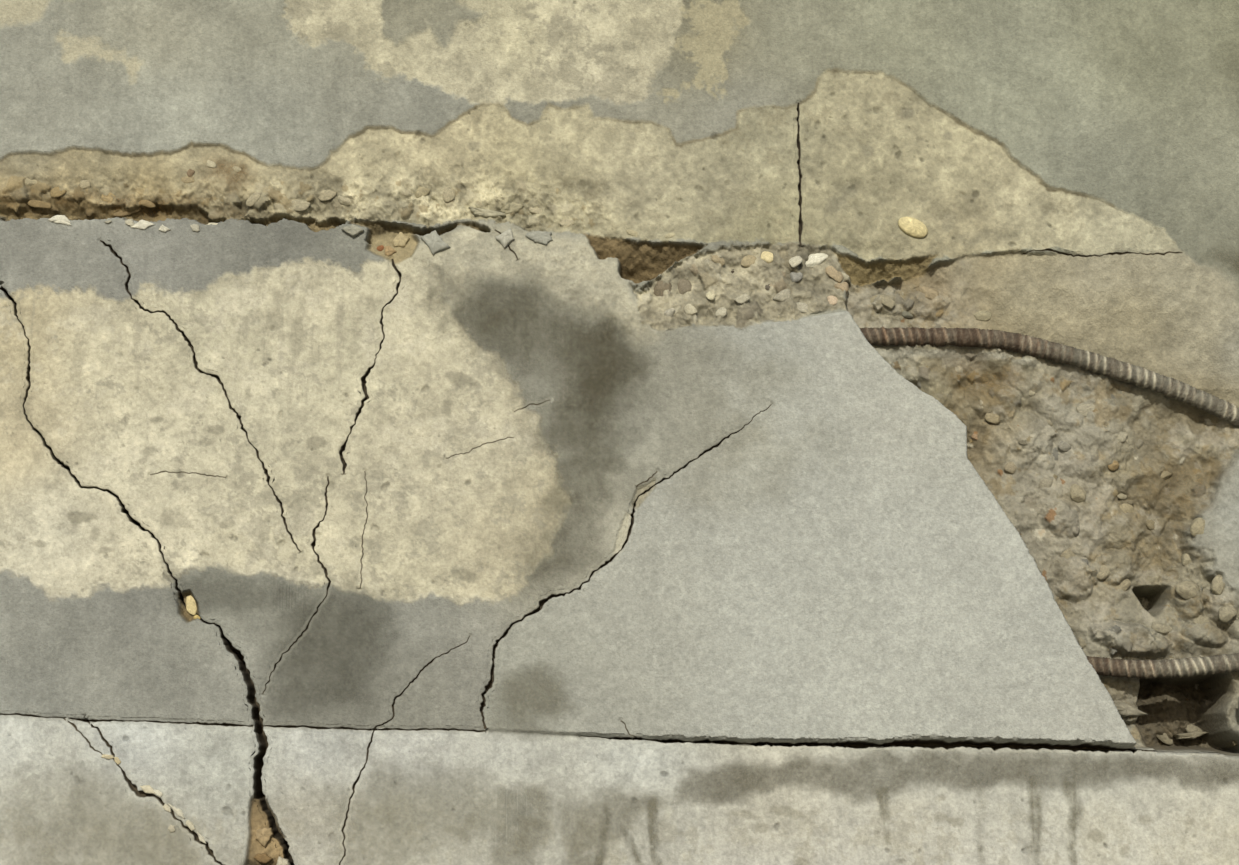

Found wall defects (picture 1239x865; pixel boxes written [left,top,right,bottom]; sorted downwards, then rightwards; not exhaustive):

peeling [0,0,1239,661]
crack [0,237,773,865]
crack [581,719,1239,758]
spalling [1098,671,1239,753]
leakage [648,800,657,858]
leakage [687,754,1051,808]
leakage [1065,758,1239,831]